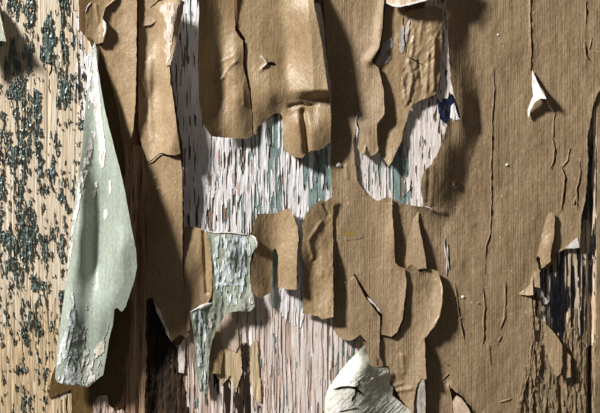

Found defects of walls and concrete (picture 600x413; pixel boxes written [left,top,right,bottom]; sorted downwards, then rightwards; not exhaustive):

peeling [0,0,137,413]
peeling [138,0,600,413]
crack [484,74,496,274]
crack [550,114,582,210]
crack [482,282,507,344]